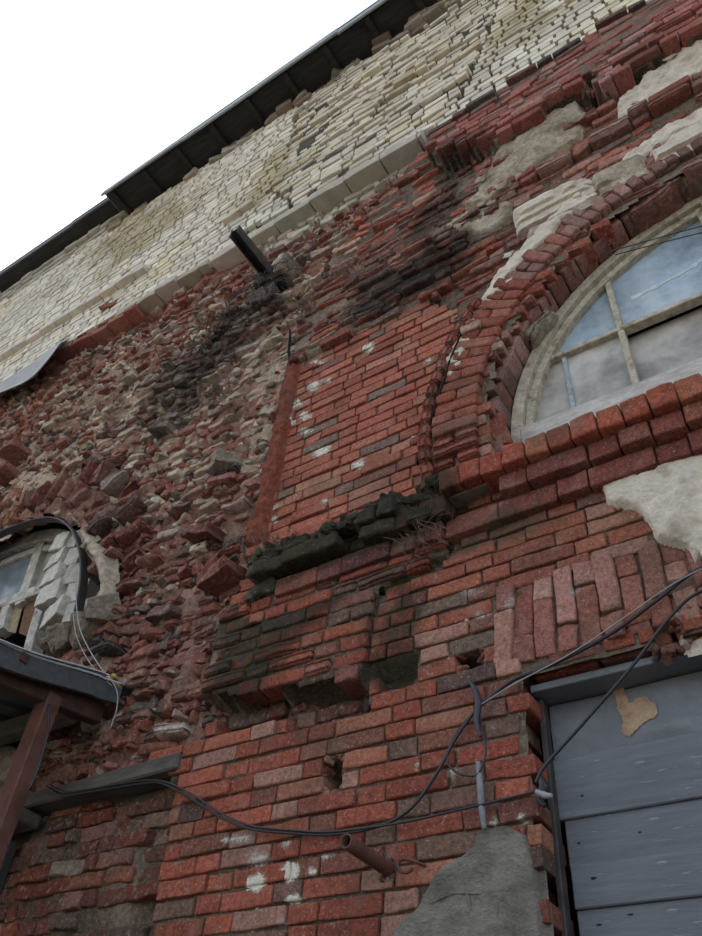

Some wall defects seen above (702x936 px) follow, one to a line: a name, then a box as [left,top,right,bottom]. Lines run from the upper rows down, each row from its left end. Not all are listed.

flaking render [617,40,702,126]
flaking render [446,73,598,235]
flaking render [622,107,702,161]
flaking render [481,186,597,301]
water stain [307,377,332,392]
water stain [290,399,314,436]
spalling [0,156,416,795]
water stain [311,445,331,460]
flaking render [603,454,702,563]
water stain [246,852,271,893]
water stain [285,894,304,905]
water stain [280,861,316,883]